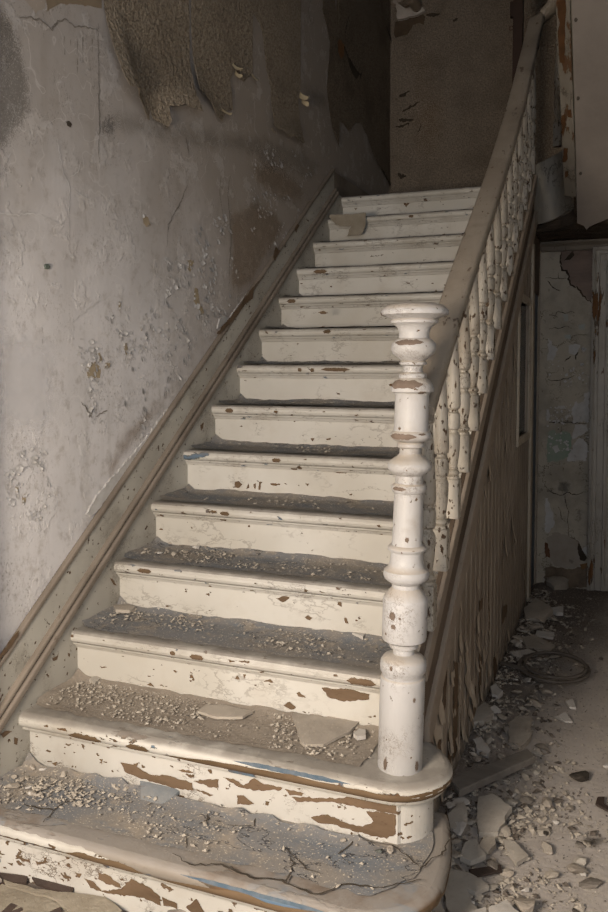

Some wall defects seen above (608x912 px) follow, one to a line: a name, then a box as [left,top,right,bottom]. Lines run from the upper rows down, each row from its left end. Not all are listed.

crack [20,16,100,61]
peeling [557,0,566,63]
crack [548,274,579,381]
peeling [546,344,590,462]
peeling [121,762,396,839]
crack [172,804,451,895]
peeling [67,872,204,912]